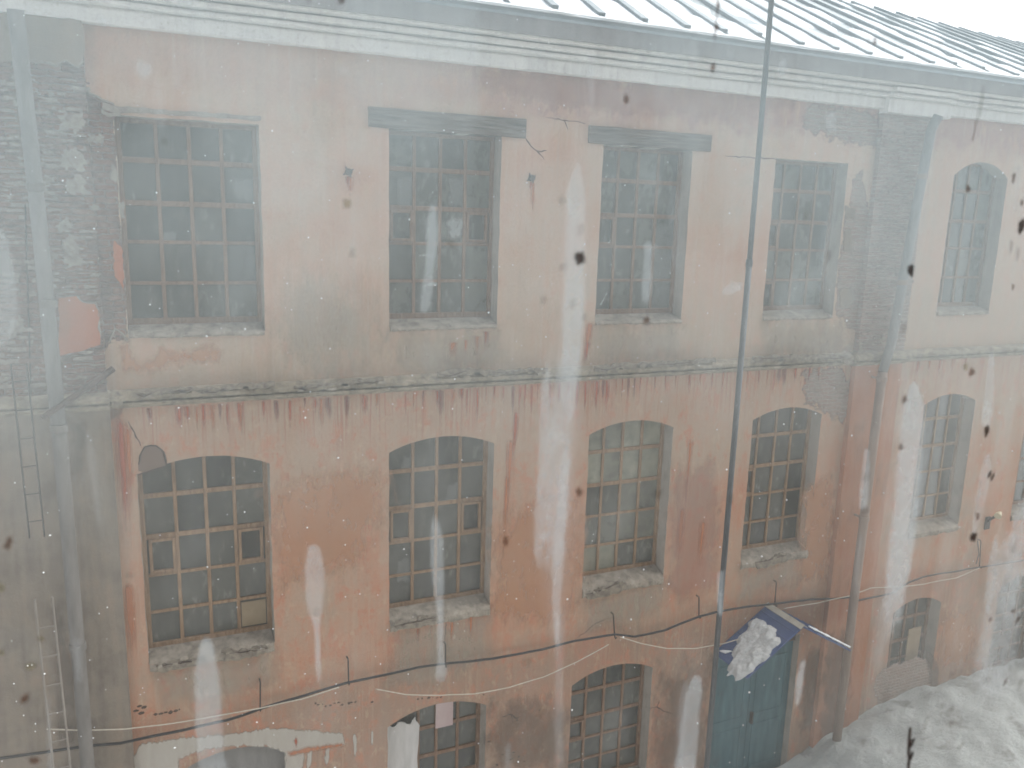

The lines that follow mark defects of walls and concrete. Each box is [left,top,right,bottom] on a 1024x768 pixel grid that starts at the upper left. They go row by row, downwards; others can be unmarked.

peeling [57,109,104,195]
spalling [802,103,880,148]
peeling [58,296,102,356]